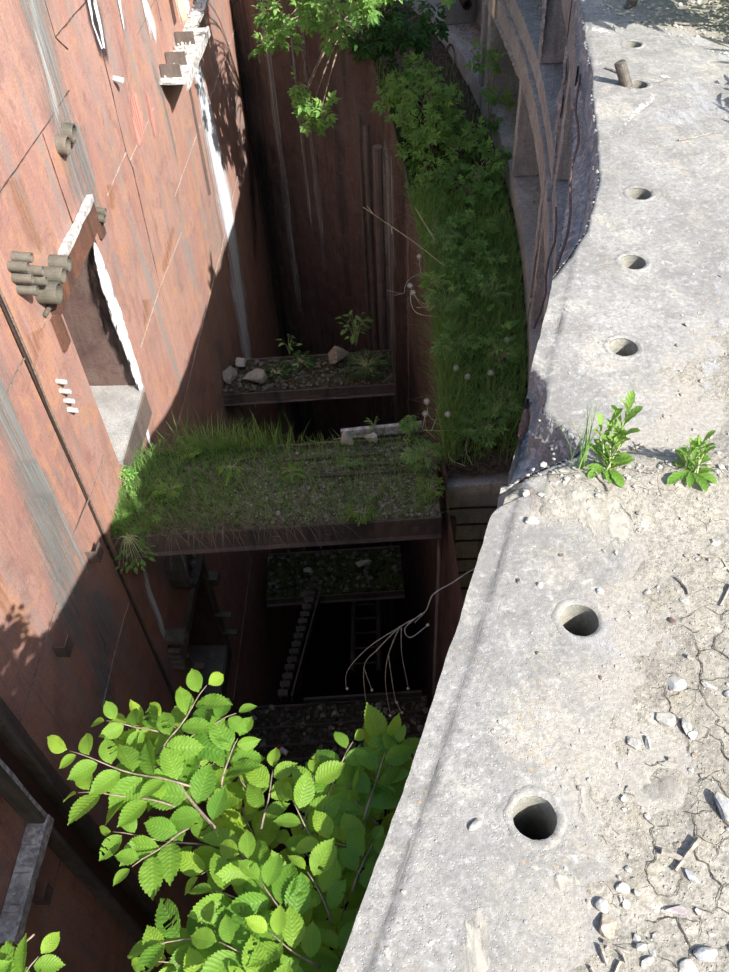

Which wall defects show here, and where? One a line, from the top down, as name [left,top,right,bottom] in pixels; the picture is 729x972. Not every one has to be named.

rust [131,92,156,146]
spalling [533,0,599,329]
spalling [500,370,585,494]